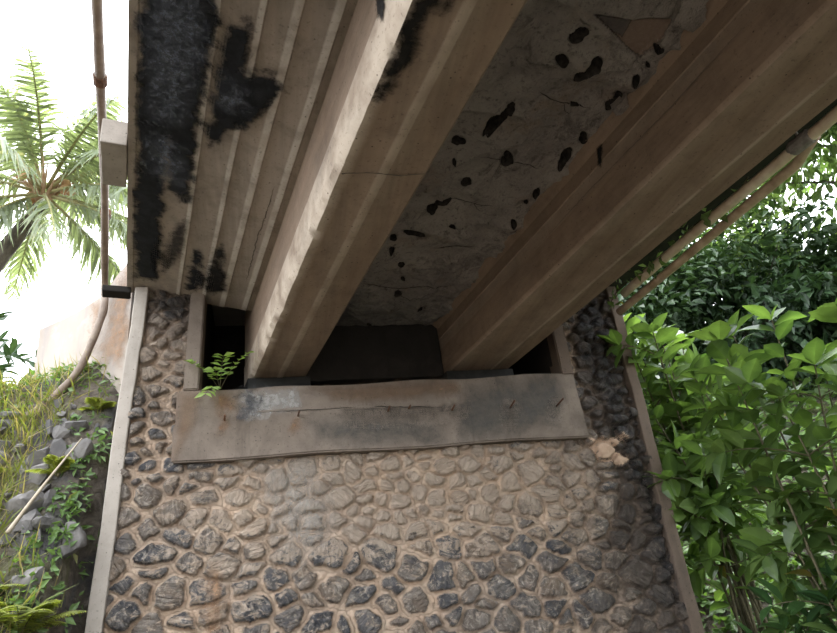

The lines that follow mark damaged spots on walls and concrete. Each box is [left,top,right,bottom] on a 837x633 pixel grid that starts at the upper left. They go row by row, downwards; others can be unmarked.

spalling [376,0,384,20]
mould [371,0,451,102]
spalling [595,14,672,68]
spalling [605,90,623,111]
mould [132,0,283,281]
hole [558,147,572,172]
mould [153,248,226,323]